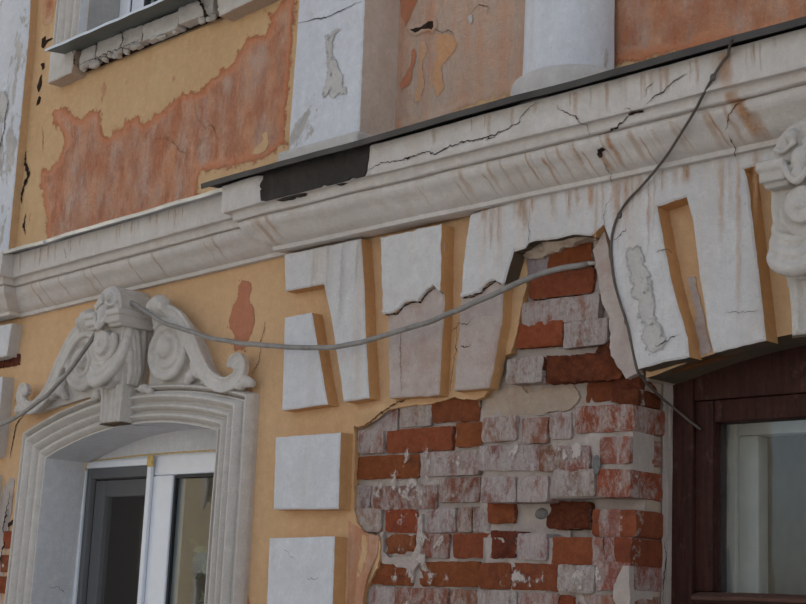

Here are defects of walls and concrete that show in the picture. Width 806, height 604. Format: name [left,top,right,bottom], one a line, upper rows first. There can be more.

crack [21,134,44,235]
peeling [39,0,373,239]
crack [363,102,536,177]
peeling [395,0,525,129]
crack [557,74,685,135]
crack [725,97,749,157]
spalling [0,354,21,368]
peeling [227,280,255,352]
spalling [347,227,667,604]
spalling [0,477,15,604]